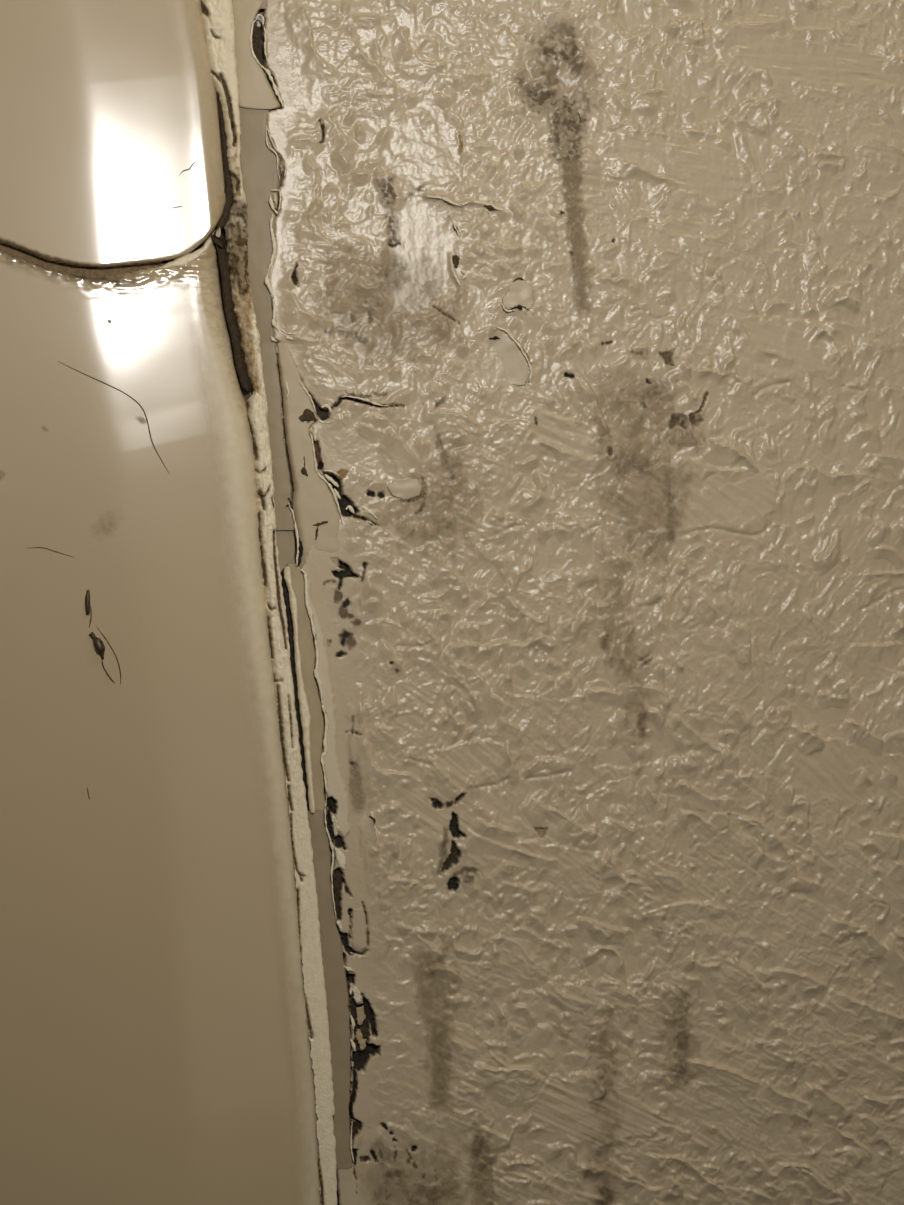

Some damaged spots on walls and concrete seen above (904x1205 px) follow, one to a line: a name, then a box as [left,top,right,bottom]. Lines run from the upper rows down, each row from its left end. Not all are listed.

spalling [249,14,284,107]
peeling [264,125,295,342]
damp [521,29,587,311]
peeling [285,380,378,540]
spalling [332,560,358,580]
spalling [300,568,381,1164]